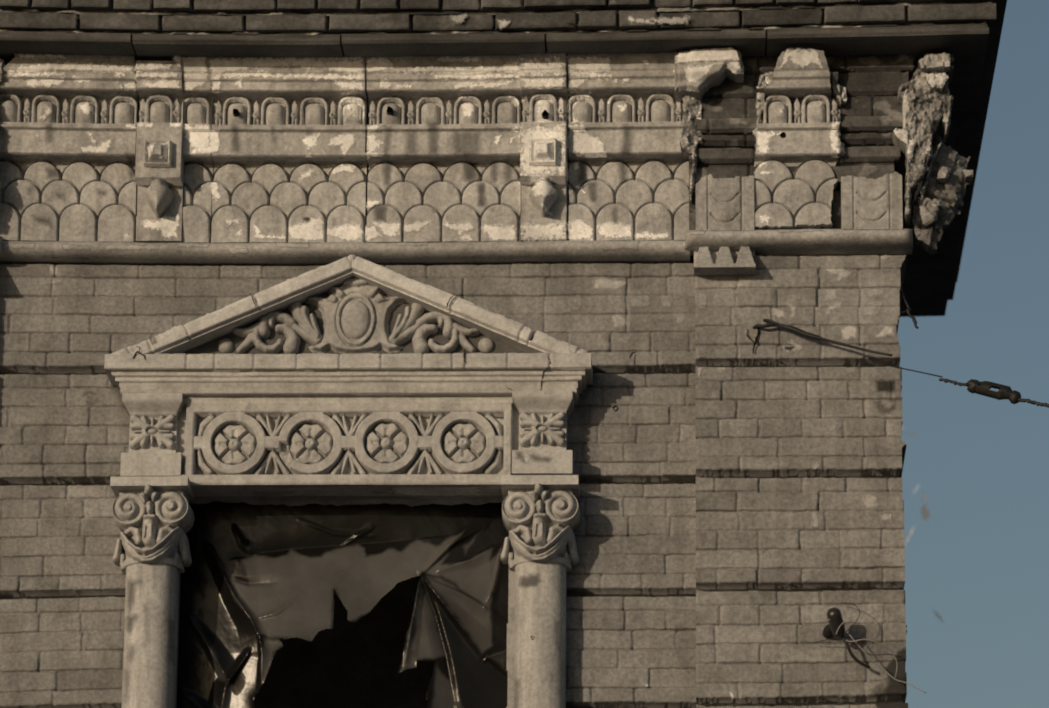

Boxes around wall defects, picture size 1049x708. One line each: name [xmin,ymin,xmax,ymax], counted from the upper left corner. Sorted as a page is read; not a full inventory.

peeling [0,54,669,251]
peeling [673,47,743,212]
spalling [892,52,973,254]